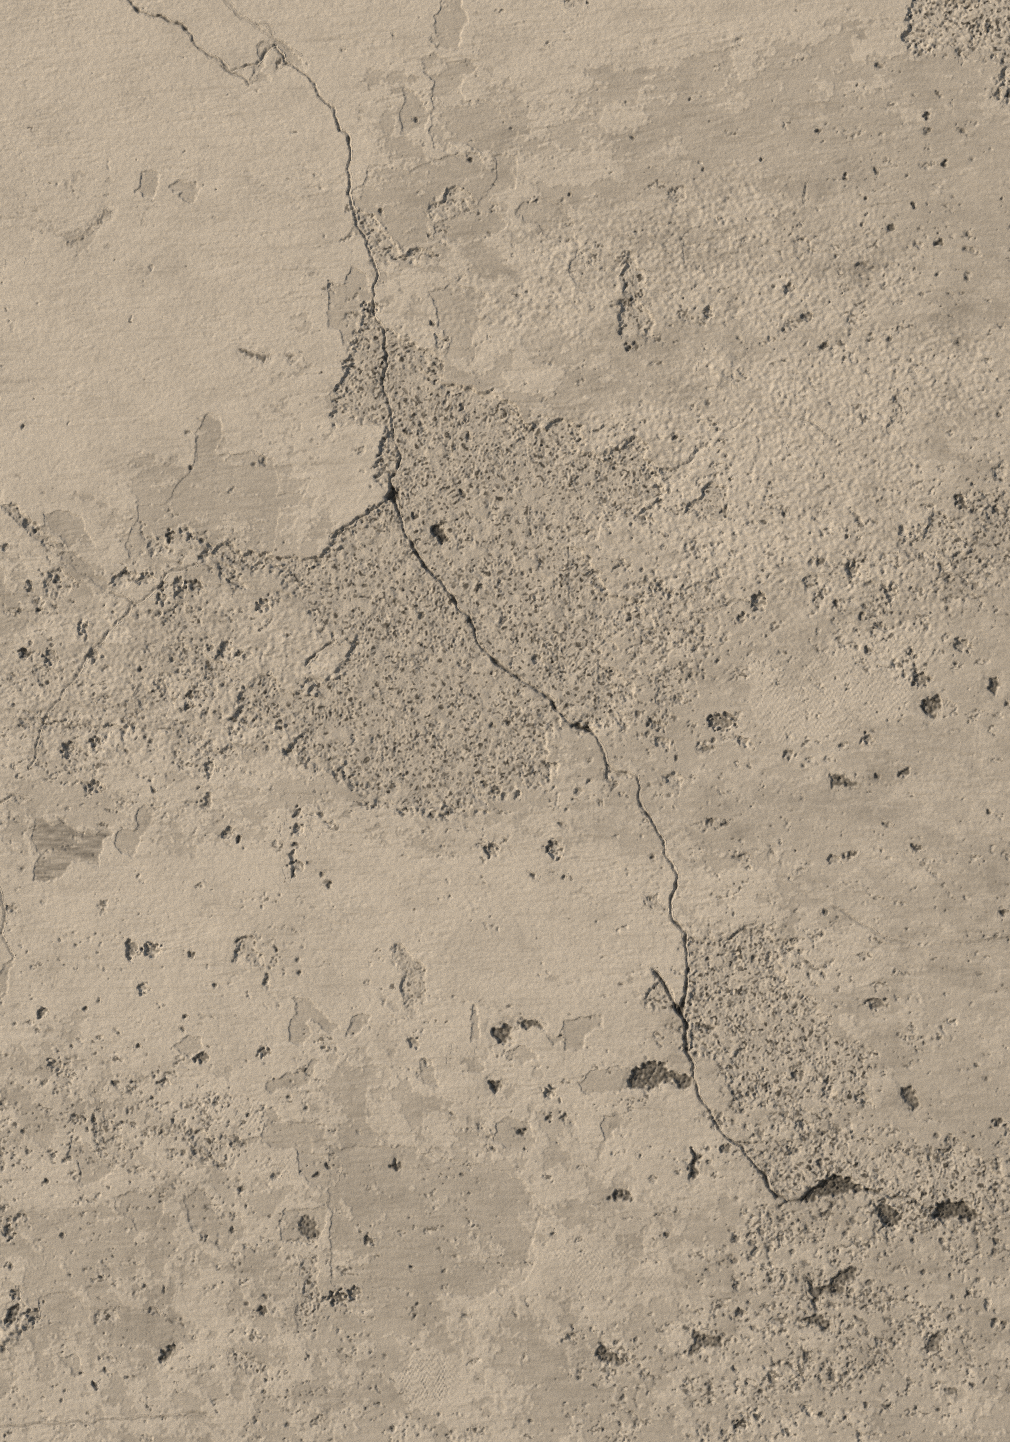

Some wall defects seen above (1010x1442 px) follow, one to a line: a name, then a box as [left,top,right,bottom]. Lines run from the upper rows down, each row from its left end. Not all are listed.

flaking render [901,0,1010,114]
flaking render [0,0,731,821]
crack [798,417,831,438]
flaking render [896,458,1010,590]
crack [127,0,806,1205]
crack [0,562,198,805]
peeling [31,786,157,882]
spalling [287,804,324,879]
crack [0,888,15,958]
crack [831,905,1010,946]
flaking render [643,924,1010,1246]
crack [864,1187,939,1212]